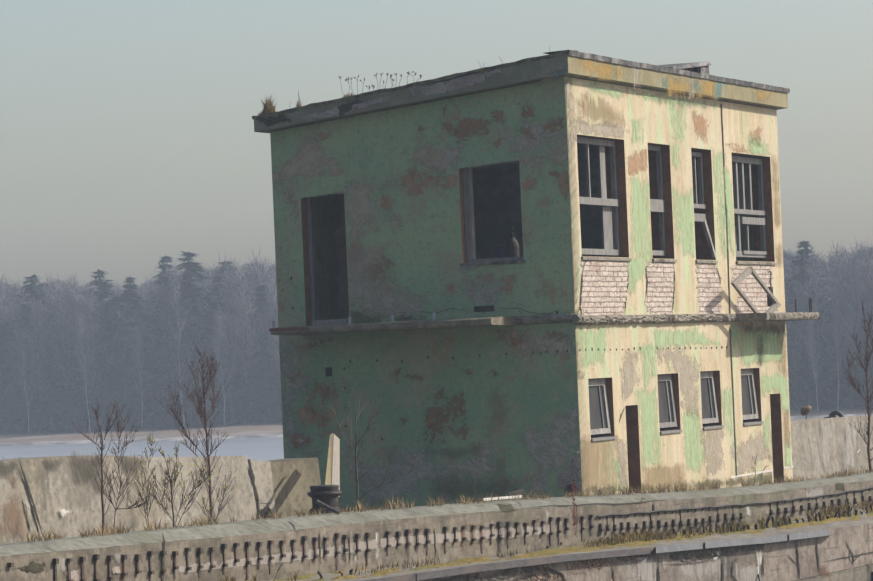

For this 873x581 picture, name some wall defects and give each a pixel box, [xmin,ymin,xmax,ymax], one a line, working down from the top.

peeling [272,133,345,218]
spalling [282,95,390,122]
spalling [513,82,676,315]
spalling [673,152,779,314]
peeling [726,127,769,154]
flaking render [510,405,582,496]